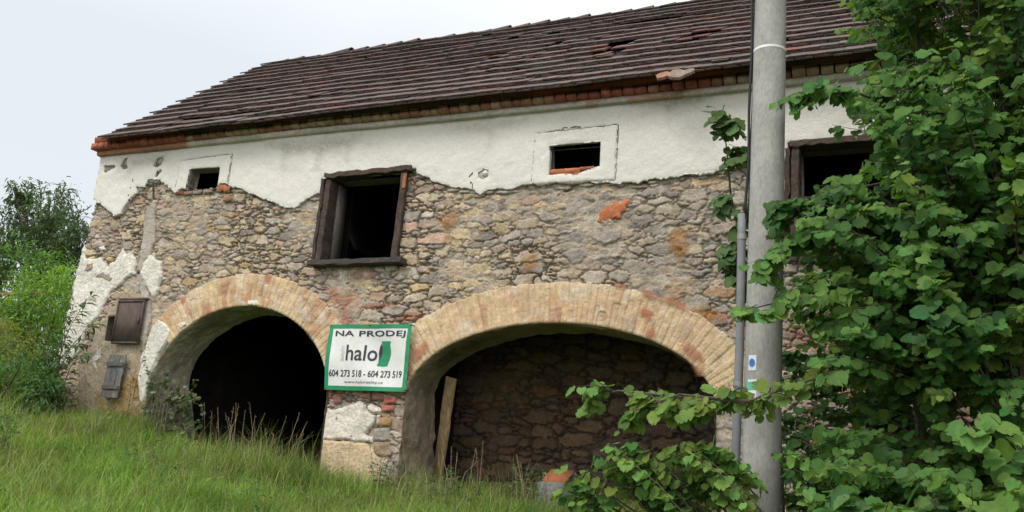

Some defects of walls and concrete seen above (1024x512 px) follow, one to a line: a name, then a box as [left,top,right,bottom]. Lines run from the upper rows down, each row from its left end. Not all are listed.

flaking render [122,157,182,215]
flaking render [416,169,526,198]
flaking render [540,183,594,191]
flaking render [597,180,657,223]